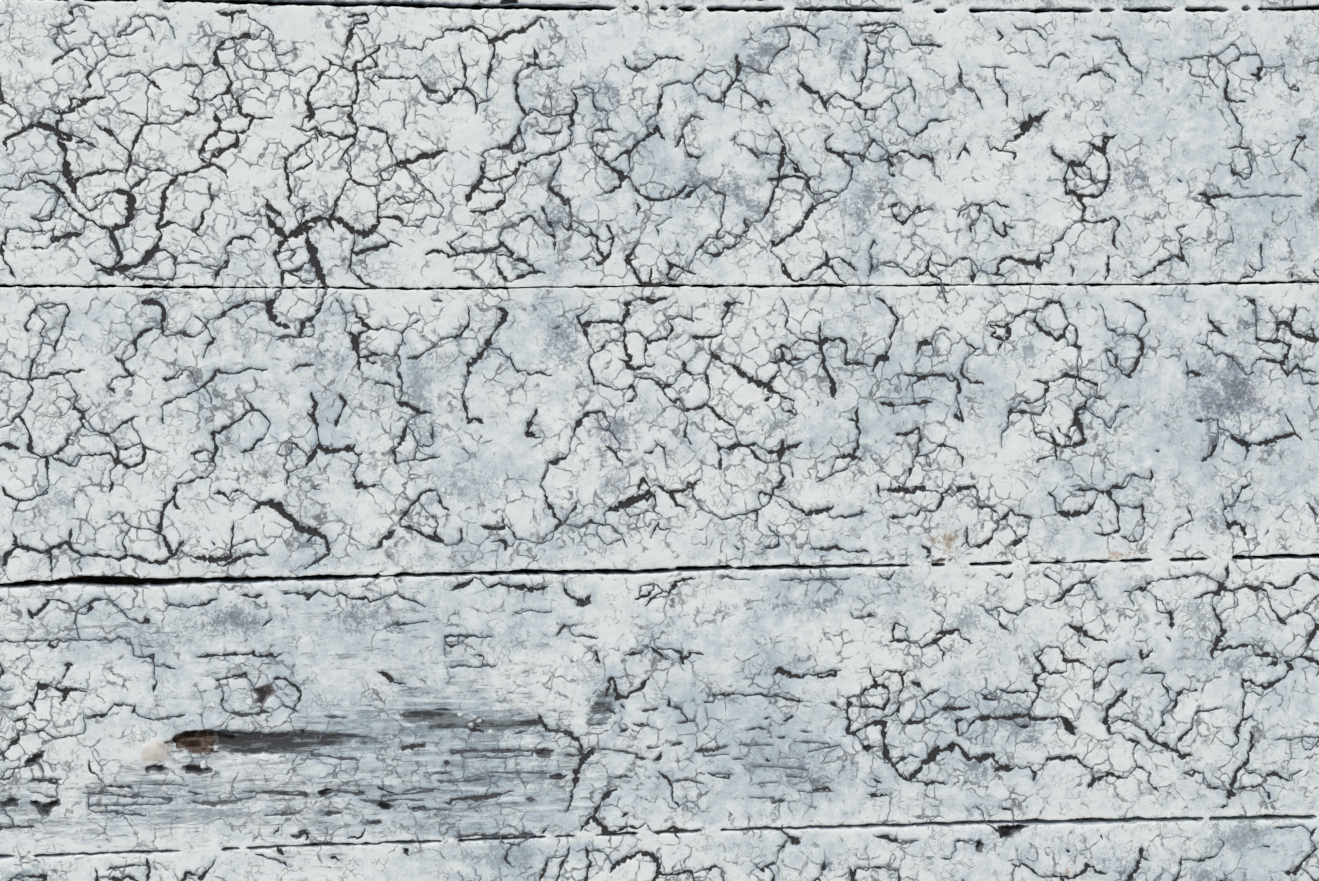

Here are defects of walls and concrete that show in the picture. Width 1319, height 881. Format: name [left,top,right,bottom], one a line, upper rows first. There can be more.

crack [0,4,1319,668]
crack [0,598,367,798]
peeling [399,709,542,735]
crack [83,563,1319,881]
peeling [145,729,385,776]
spalling [534,747,568,780]
crack [0,809,35,830]
spalling [376,800,395,810]
crack [8,873,47,881]